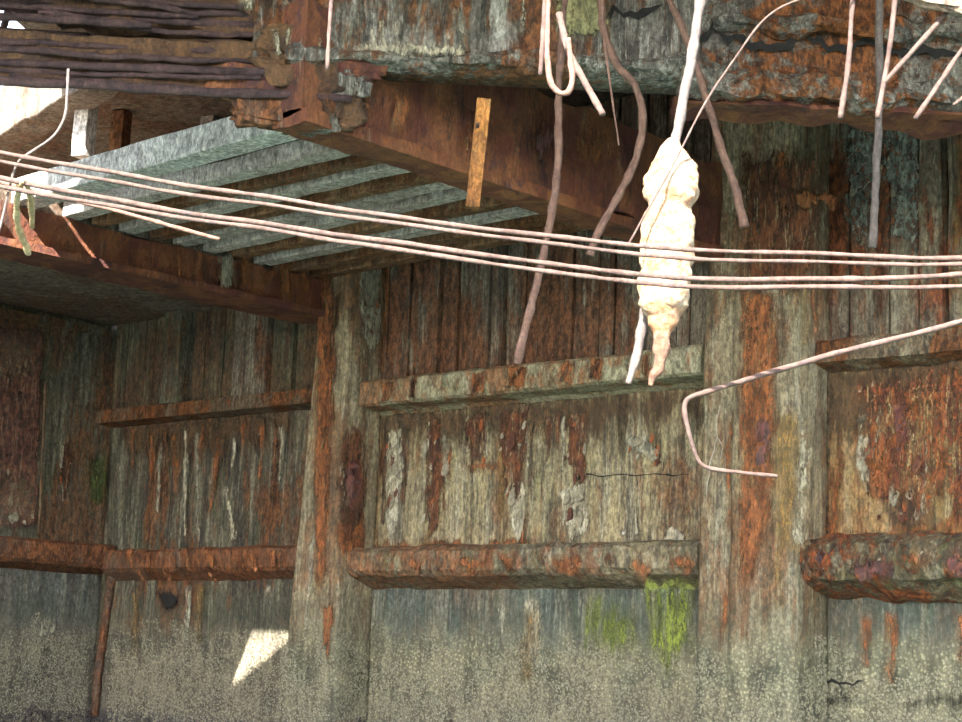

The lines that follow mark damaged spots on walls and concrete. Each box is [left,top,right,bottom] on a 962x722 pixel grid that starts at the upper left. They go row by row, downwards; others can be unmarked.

crack [608,4,663,20]
crack [700,22,962,59]
rust [392,84,414,131]
spalling [0,0,962,253]
rust [526,111,554,164]
rust [719,149,836,648]
rust [119,410,292,540]
rust [305,277,340,634]
crack [586,405,723,495]
rust [826,360,962,535]
rust [322,603,334,658]
crack [827,678,863,694]